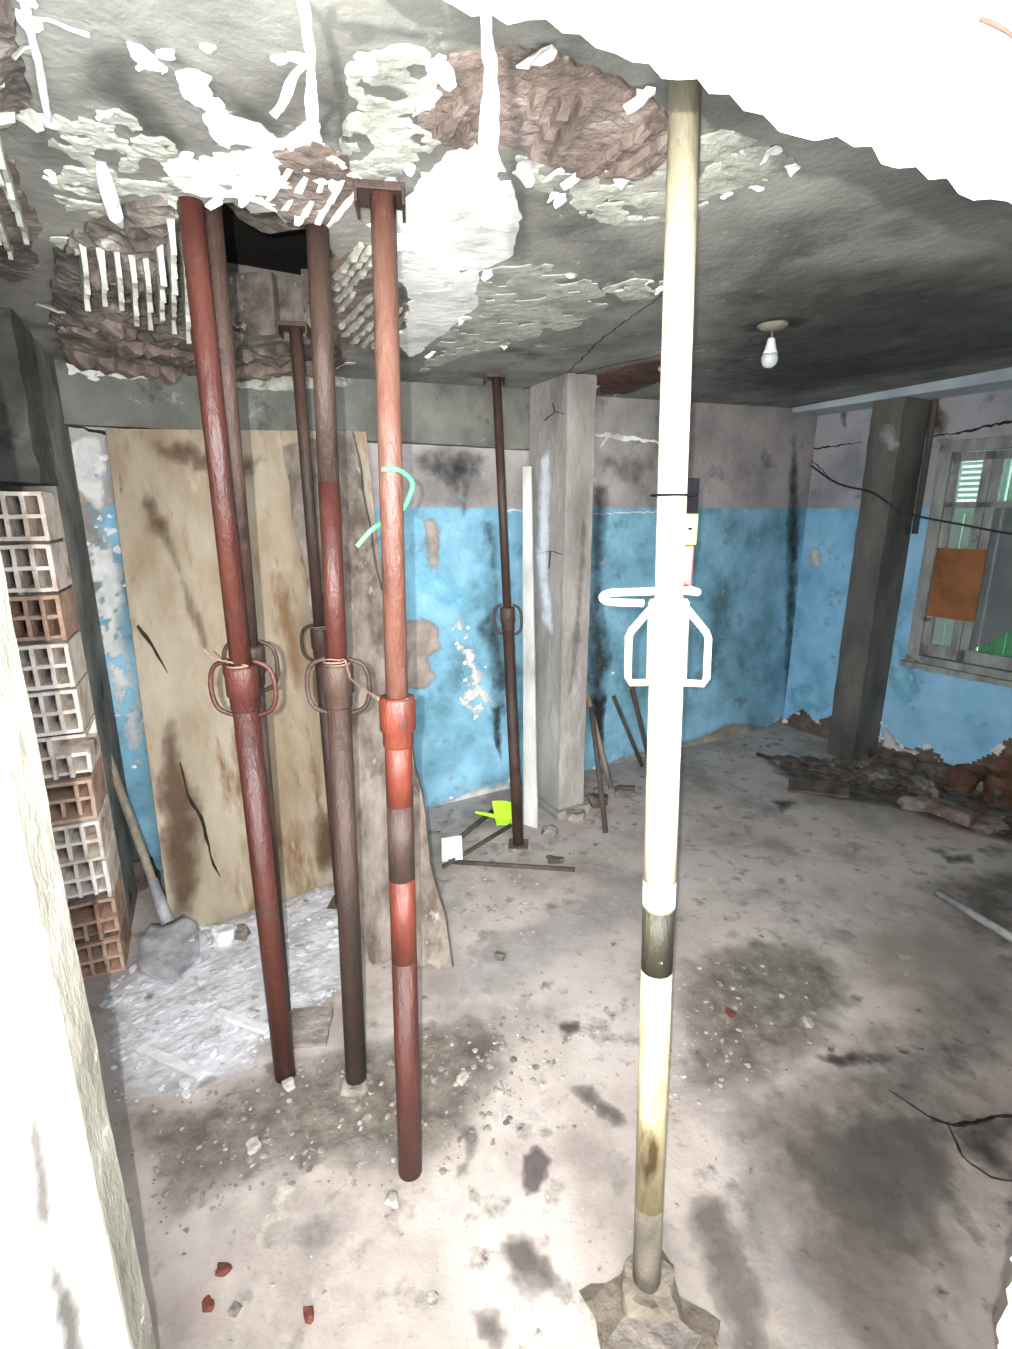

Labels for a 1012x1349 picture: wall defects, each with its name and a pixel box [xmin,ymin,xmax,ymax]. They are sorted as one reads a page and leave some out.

spalling [0,0,668,373]
peeling [698,129,801,210]
water stain [432,454,475,484]
peeling [424,520,440,567]
peeling [71,437,143,769]
peeling [406,619,491,720]
flaking render [876,721,1012,774]
crack [889,1090,1012,1182]